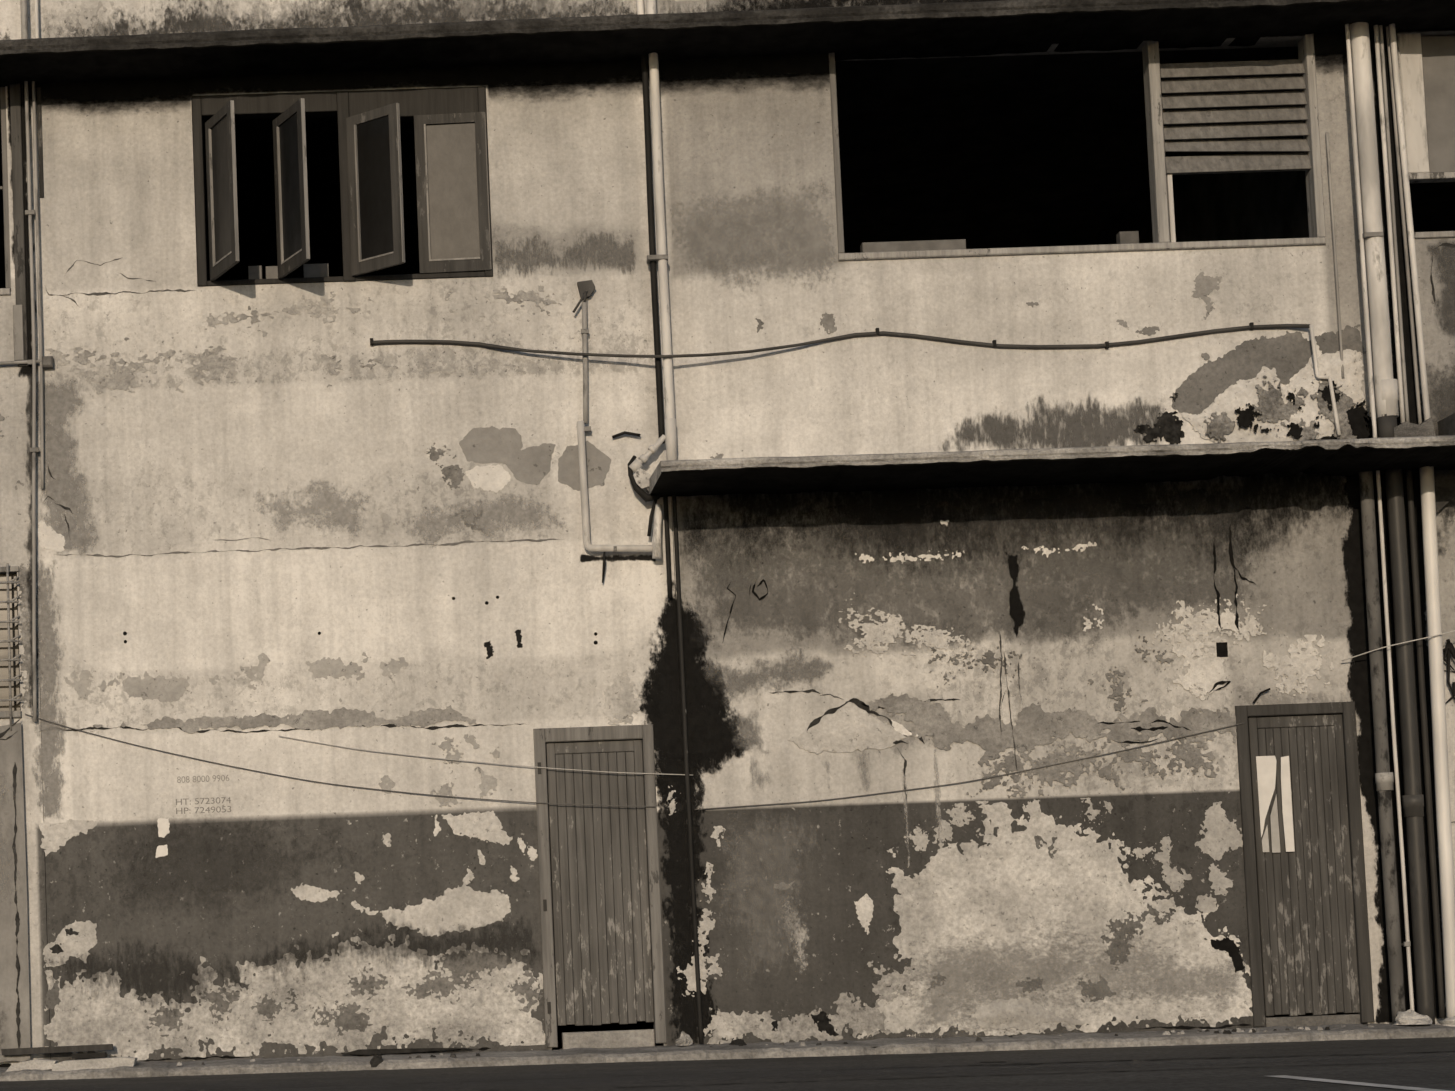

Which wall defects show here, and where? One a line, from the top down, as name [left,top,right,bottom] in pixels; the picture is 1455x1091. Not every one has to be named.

mould [74,0,634,37]
water stain [1263,32,1353,72]
water stain [1369,28,1455,436]
spalling [1134,324,1369,445]
water stain [943,397,1162,451]
water stain [1364,412,1378,438]
spalling [426,443,465,490]
peeling [558,441,611,491]
water stain [683,472,1455,1023]
peeling [667,785,681,816]
peeling [39,652,545,1061]
peeling [676,635,1253,1044]